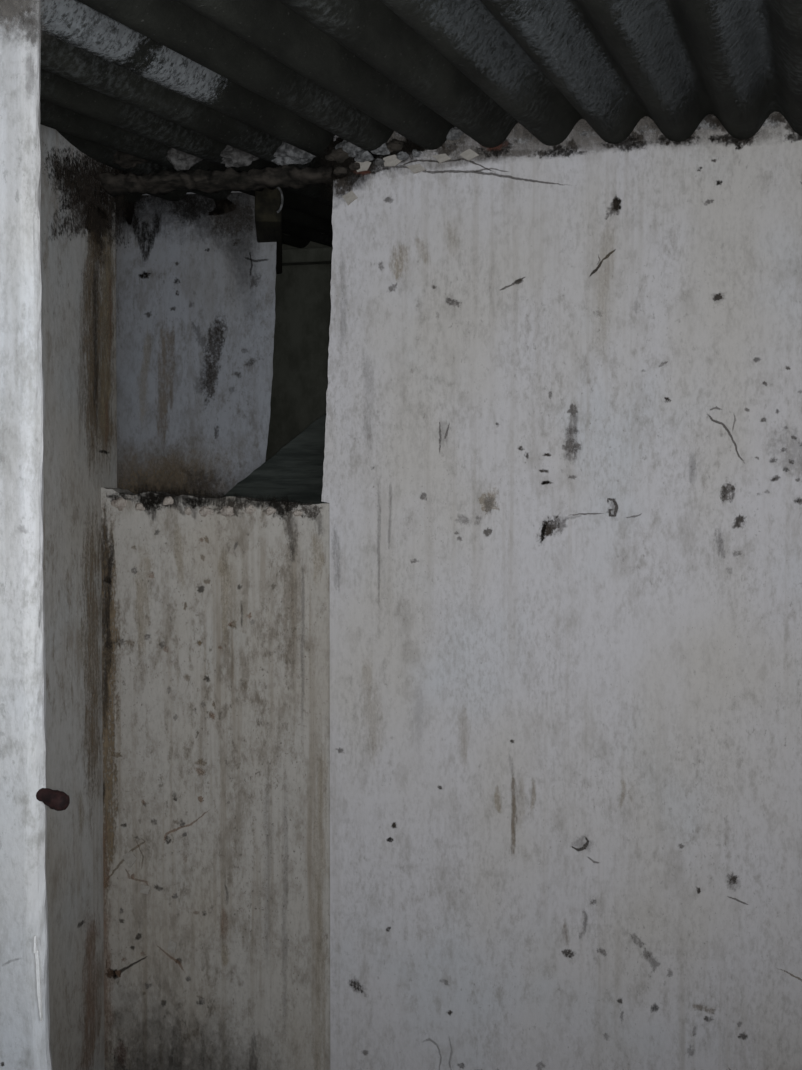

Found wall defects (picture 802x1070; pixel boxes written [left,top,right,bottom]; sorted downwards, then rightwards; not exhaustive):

water stain [205,322,225,401]